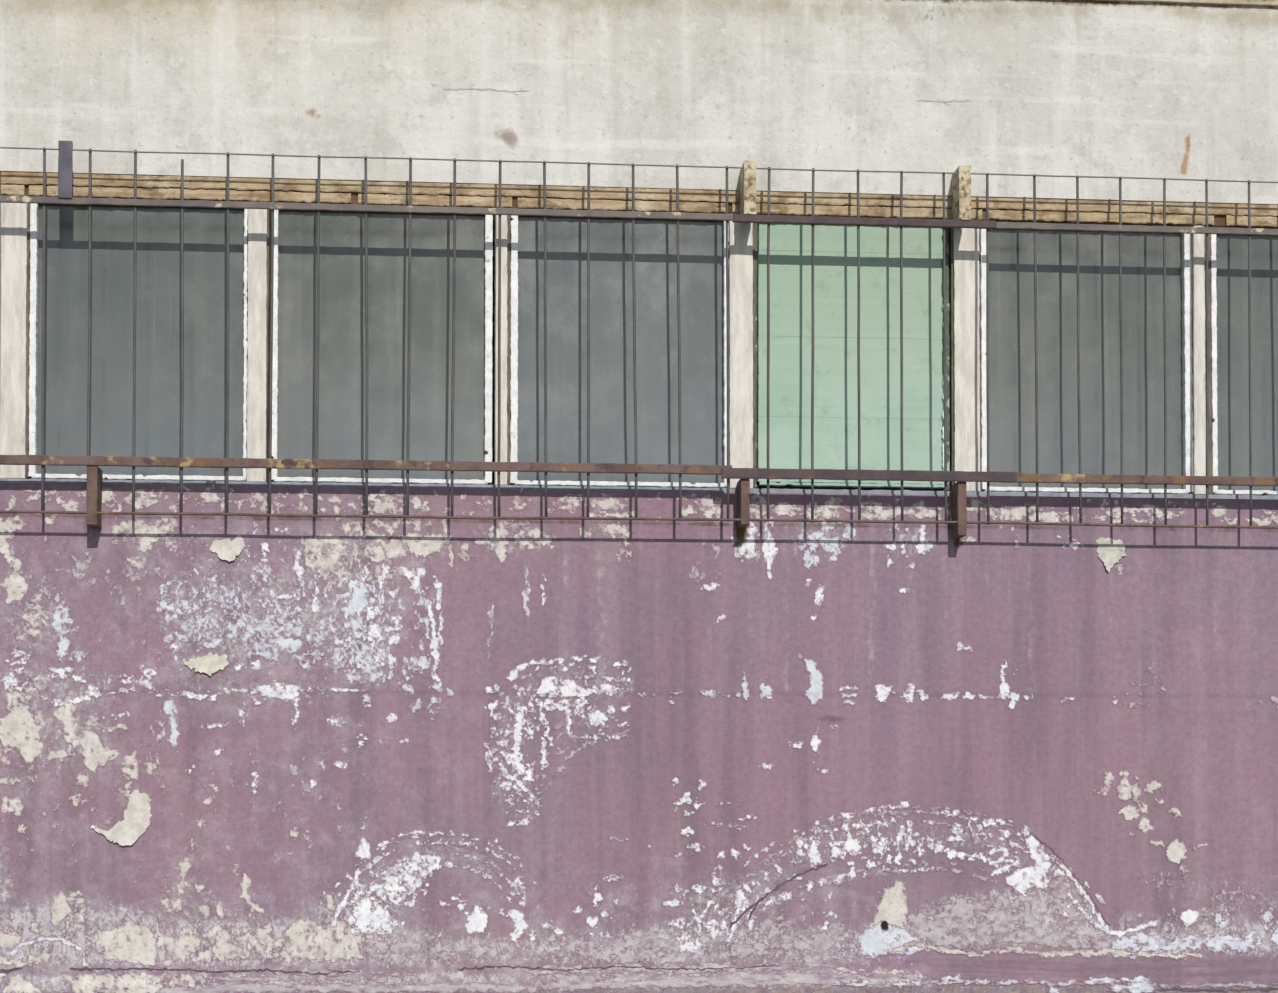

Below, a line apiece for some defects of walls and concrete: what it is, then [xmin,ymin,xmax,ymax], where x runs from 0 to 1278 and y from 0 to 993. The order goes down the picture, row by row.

peeling [0,480,1278,993]
crack [729,863,828,929]
crack [0,966,23,974]
crack [70,967,359,976]
crack [459,964,781,975]
crack [1158,985,1278,993]